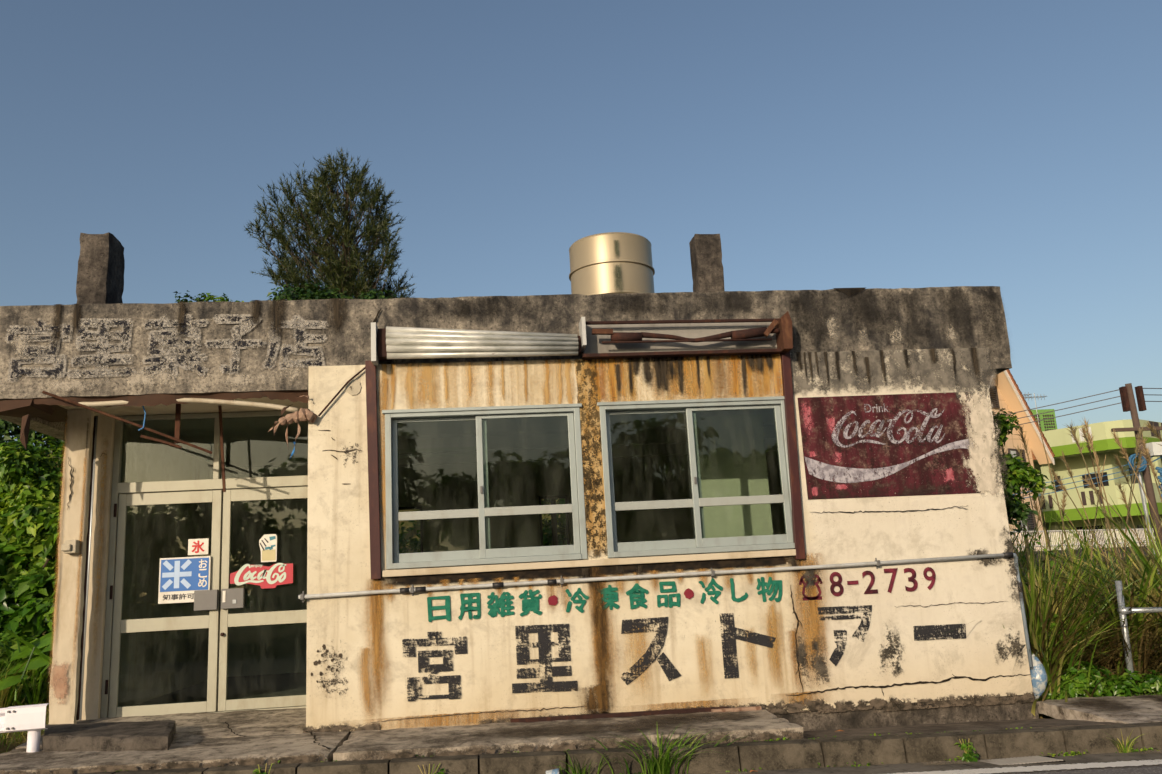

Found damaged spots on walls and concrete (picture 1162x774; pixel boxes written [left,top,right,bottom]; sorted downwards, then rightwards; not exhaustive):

water stain [53,304,81,344]
water stain [252,300,285,337]
water stain [453,296,512,316]
water stain [602,240,665,313]
rust [655,354,783,400]
water stain [790,287,1001,400]
rust [381,362,448,528]
rust [544,358,641,550]
rust [361,579,409,709]
rust [590,572,638,672]
rust [768,555,822,679]
crack [790,586,1030,696]